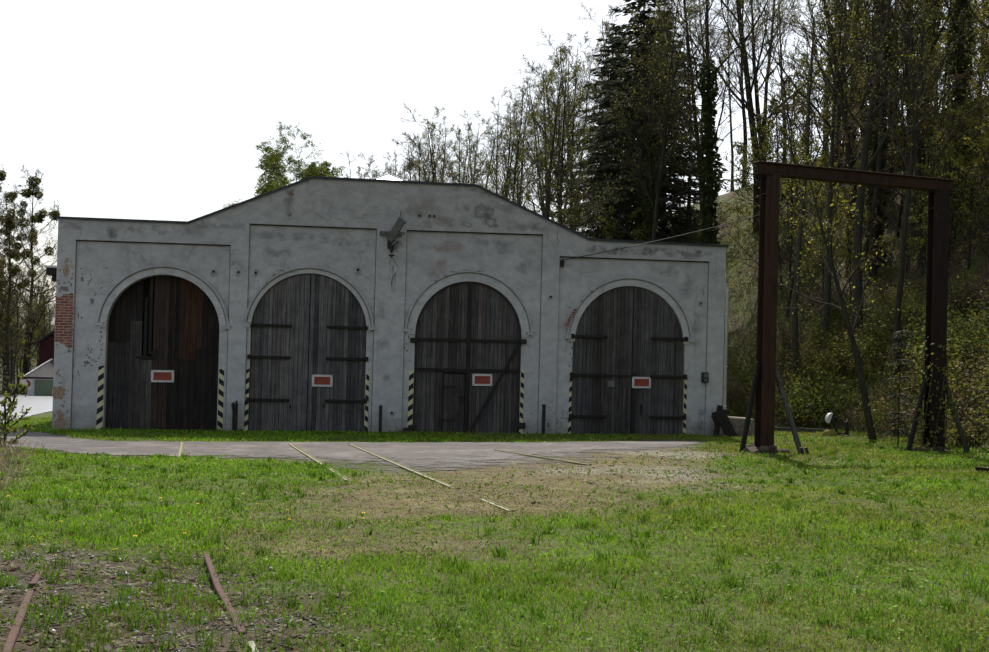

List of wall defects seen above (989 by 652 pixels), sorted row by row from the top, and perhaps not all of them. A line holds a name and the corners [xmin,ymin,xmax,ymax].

flaking render [54,258,103,353]
peeling [52,370,69,429]